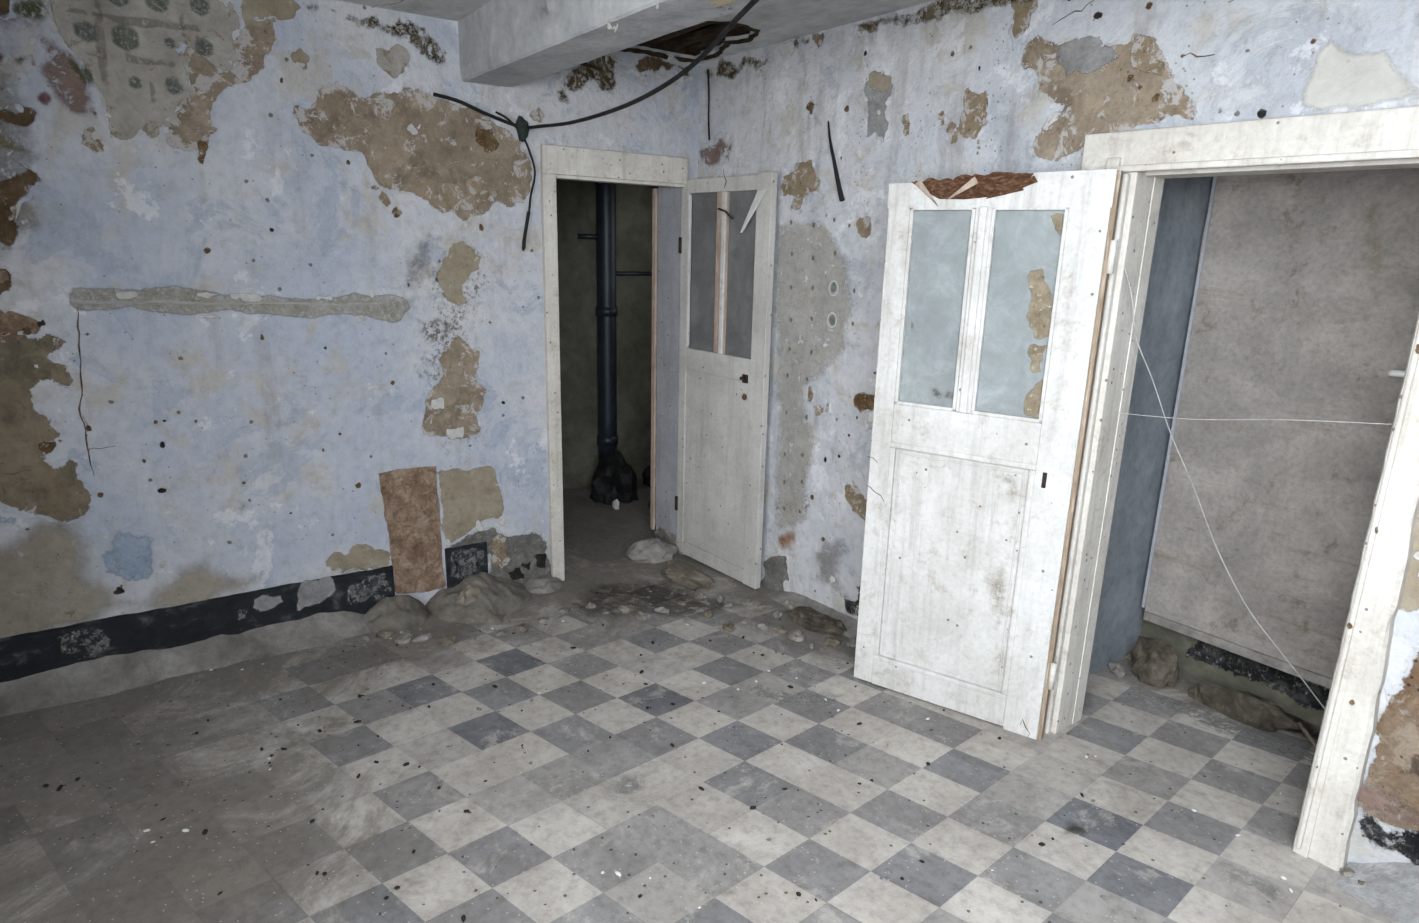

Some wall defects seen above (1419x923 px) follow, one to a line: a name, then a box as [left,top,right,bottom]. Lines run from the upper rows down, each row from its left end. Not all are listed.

peeling [0,104,39,132]
peeling [79,126,111,155]
peeling [162,1,310,164]
peeling [281,42,534,231]
peeling [935,87,994,154]
peeling [1008,0,1222,166]
peeling [0,163,104,530]
crack [77,308,114,474]
peeling [435,239,483,307]
peeling [418,334,505,443]
spalling [1357,644,1419,833]